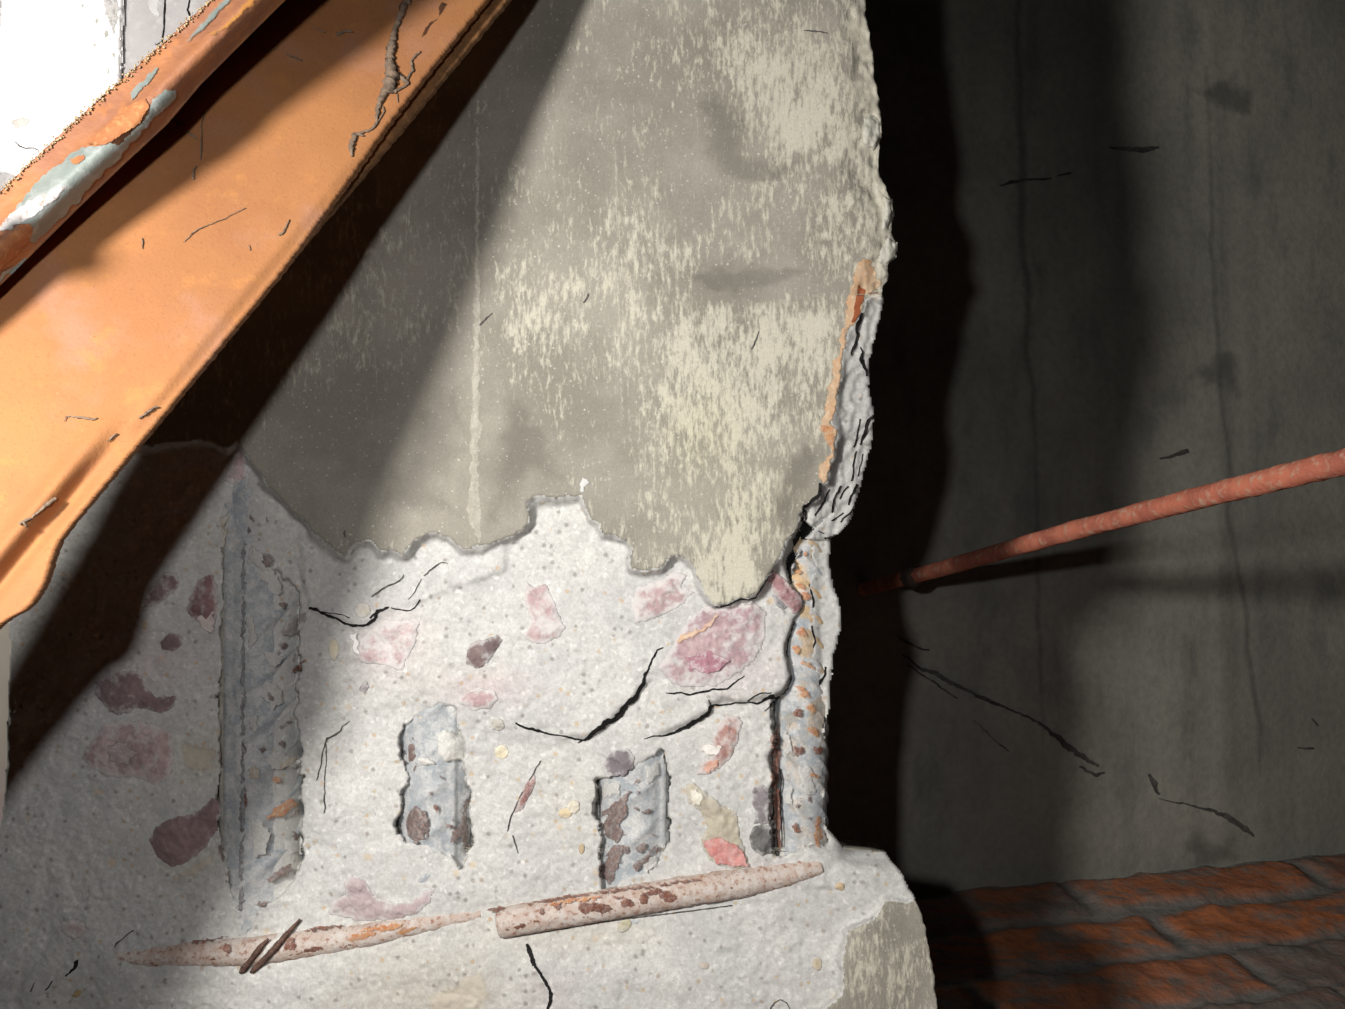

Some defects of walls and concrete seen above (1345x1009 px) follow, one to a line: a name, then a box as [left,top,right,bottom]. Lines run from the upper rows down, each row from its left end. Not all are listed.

rust [70,98,149,164]
rust [818,259,881,483]
crack [851,312,868,376]
crack [308,562,448,627]
rust [400,792,469,850]
spalling [0,296,915,1009]
rust [505,779,701,931]
crack [507,416,873,853]
rust [770,685,823,850]
crack [898,636,1105,777]
rust [284,923,416,956]
crack [514,905,732,1009]